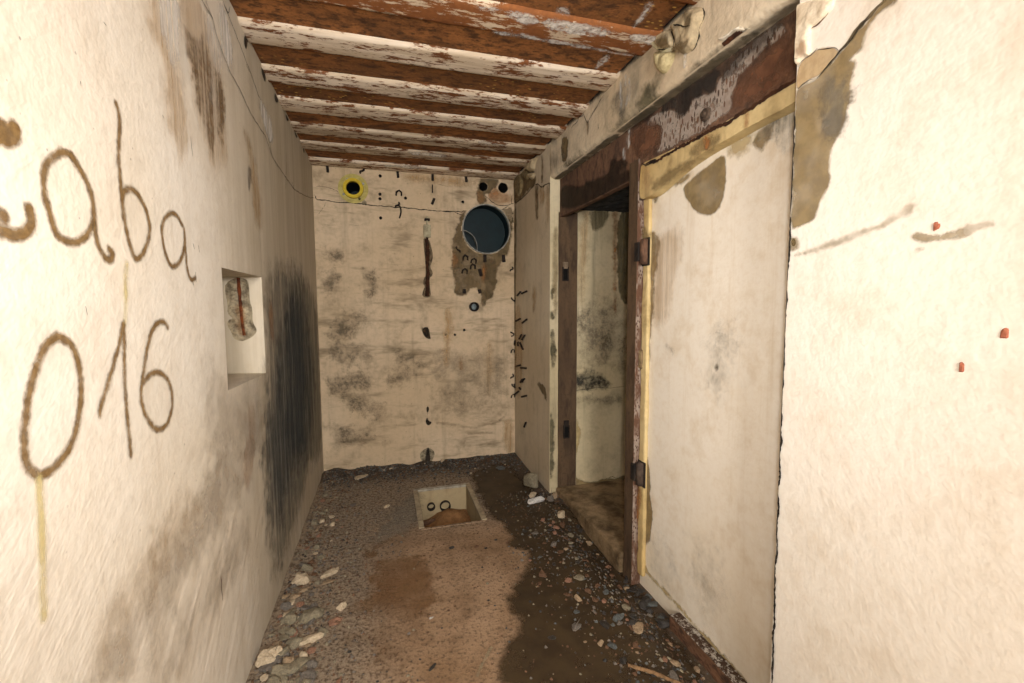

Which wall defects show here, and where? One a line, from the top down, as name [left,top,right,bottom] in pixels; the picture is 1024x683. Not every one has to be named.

peeling [648,0,838,152]
water stain [653,0,897,228]
water stain [264,270,368,568]